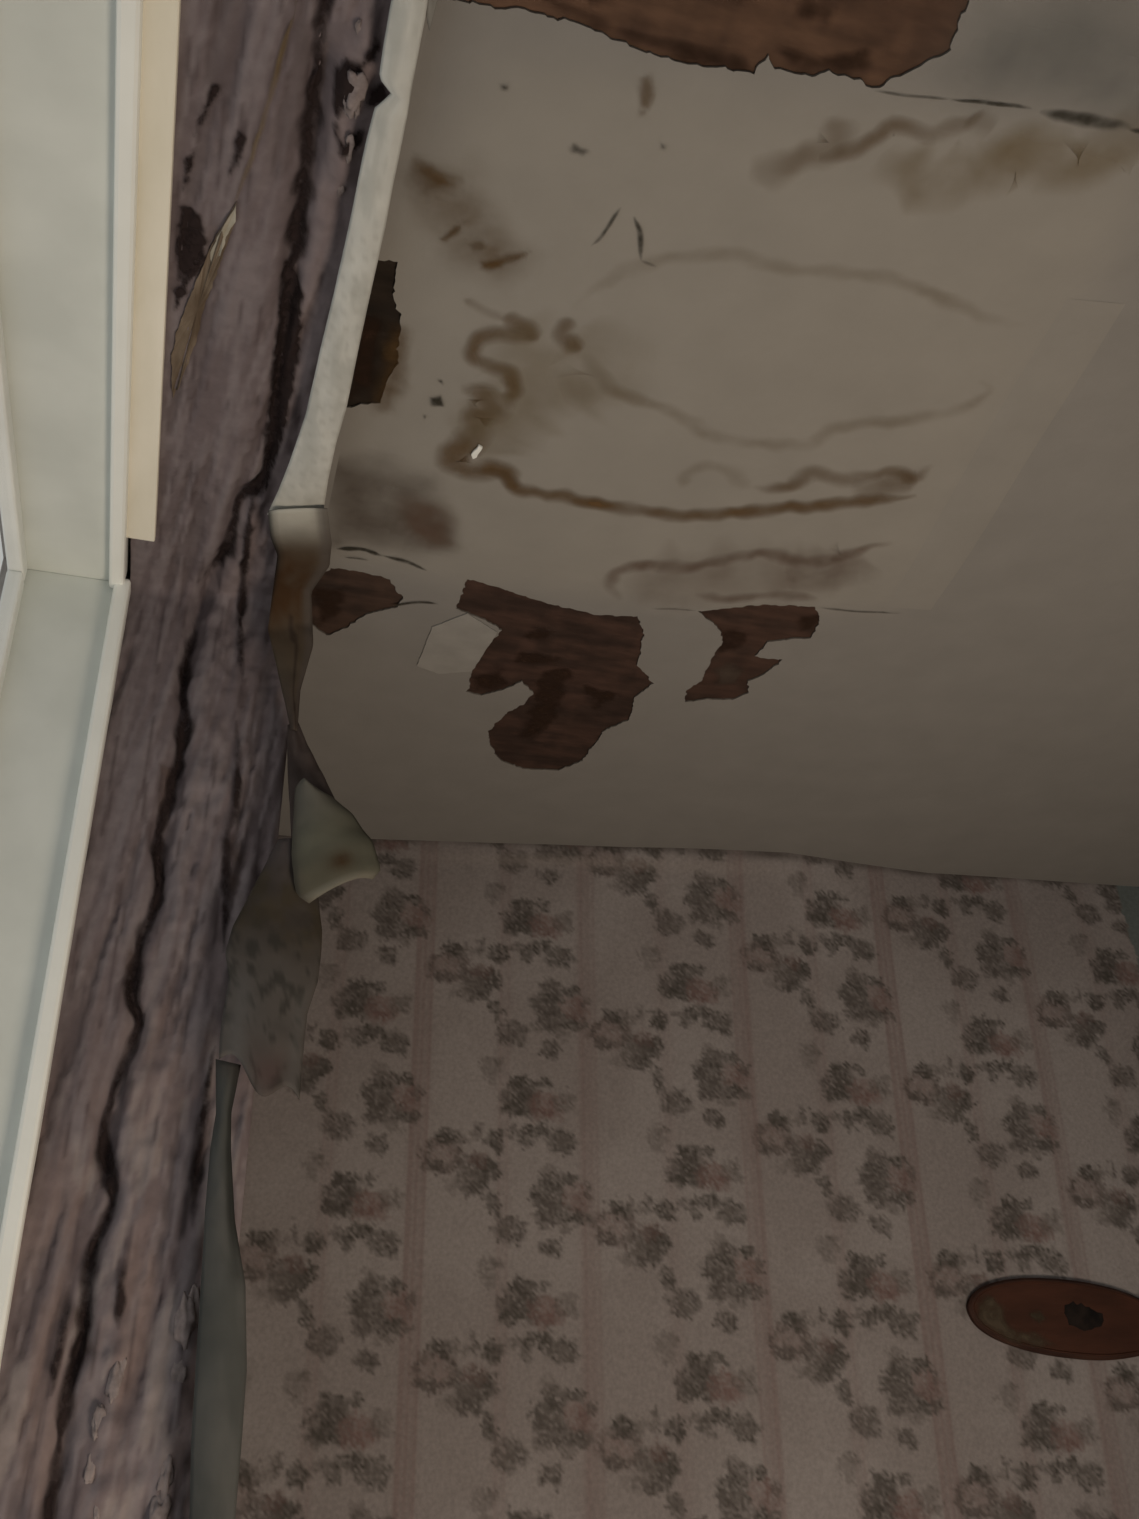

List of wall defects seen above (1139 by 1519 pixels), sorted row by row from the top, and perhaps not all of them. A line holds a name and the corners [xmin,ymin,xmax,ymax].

peeling [465,0,969,87]
peeling [347,260,401,406]
leakage [445,440,618,510]
leakage [648,486,881,518]
peeling [311,568,403,634]
peeling [417,579,653,769]
peeling [685,604,819,701]